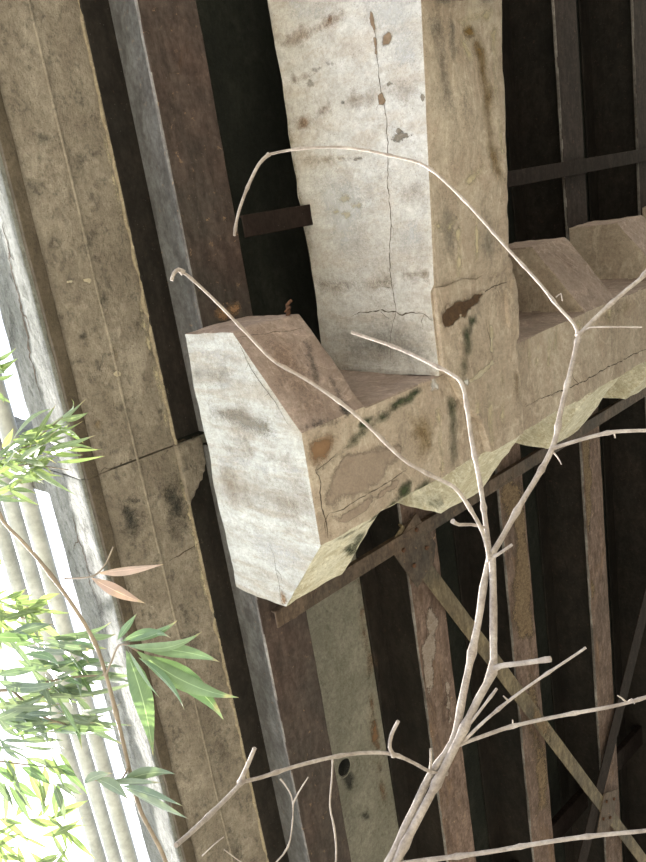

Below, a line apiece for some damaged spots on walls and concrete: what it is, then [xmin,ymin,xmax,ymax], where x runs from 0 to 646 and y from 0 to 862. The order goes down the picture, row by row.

crack [351,34,431,357]
corrosion [310,436,333,463]
crack [315,454,407,535]
peeling [421,608,438,694]